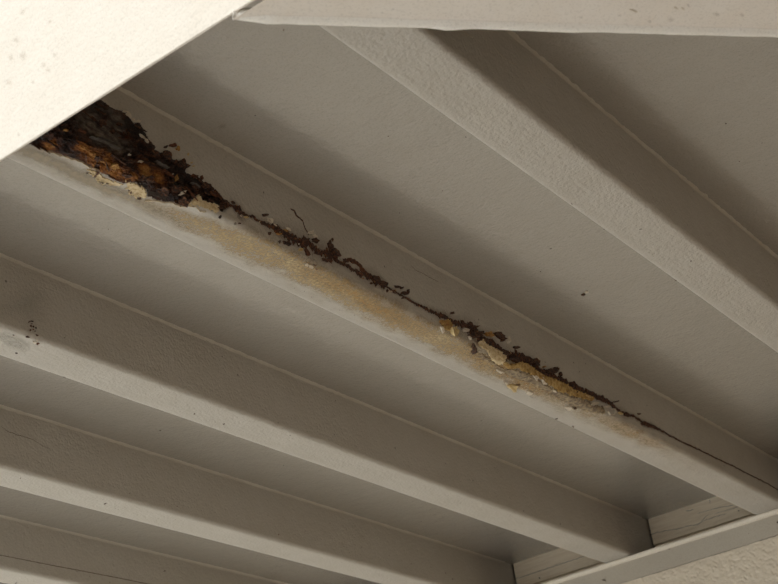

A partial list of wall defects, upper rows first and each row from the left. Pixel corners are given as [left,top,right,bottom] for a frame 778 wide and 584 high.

corrosion [165,211,550,395]
peeling [439,312,641,417]